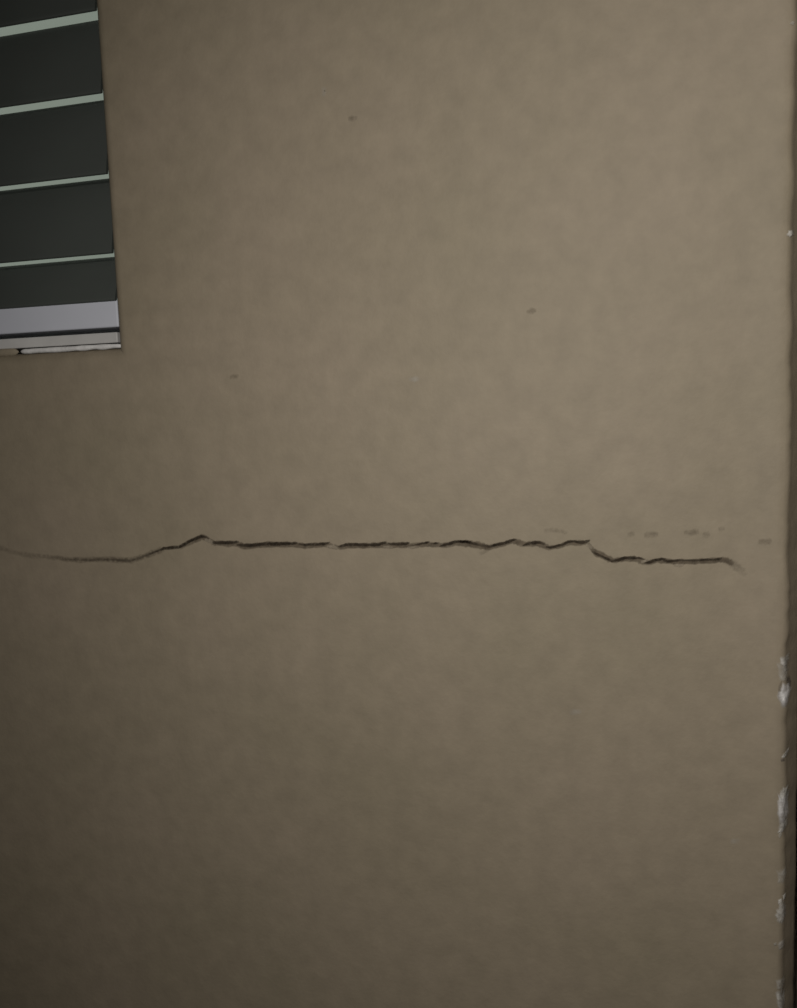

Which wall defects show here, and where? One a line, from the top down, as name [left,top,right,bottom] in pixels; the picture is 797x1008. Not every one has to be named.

crack [156,535,731,567]
peeling [779,677,791,705]
peeling [778,786,788,833]